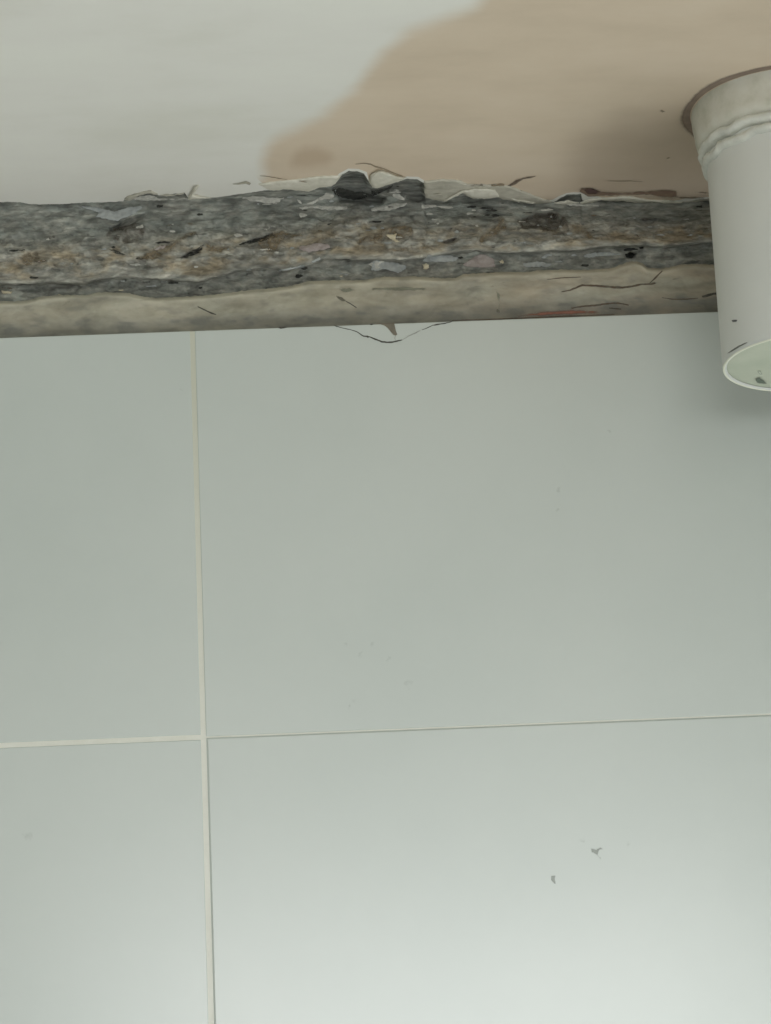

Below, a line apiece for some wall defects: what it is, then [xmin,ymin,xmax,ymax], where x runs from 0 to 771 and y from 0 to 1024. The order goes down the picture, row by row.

damp [248,0,771,200]
spalling [0,170,718,338]
crack [334,301,453,343]
crack [548,271,717,309]